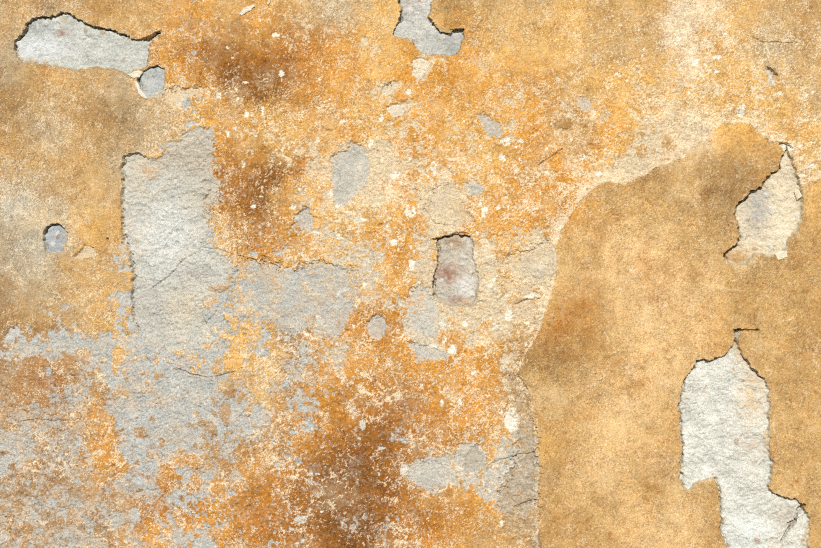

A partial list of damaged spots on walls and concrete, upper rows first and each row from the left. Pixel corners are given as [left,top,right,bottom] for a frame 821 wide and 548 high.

spalling [14,11,209,110]
peeling [380,80,408,118]
spalling [392,0,465,86]
spalling [42,223,99,261]
peeling [118,124,370,354]
peeling [465,178,486,197]
spalling [723,147,805,269]
spalling [402,234,480,365]
spalling [677,330,811,548]